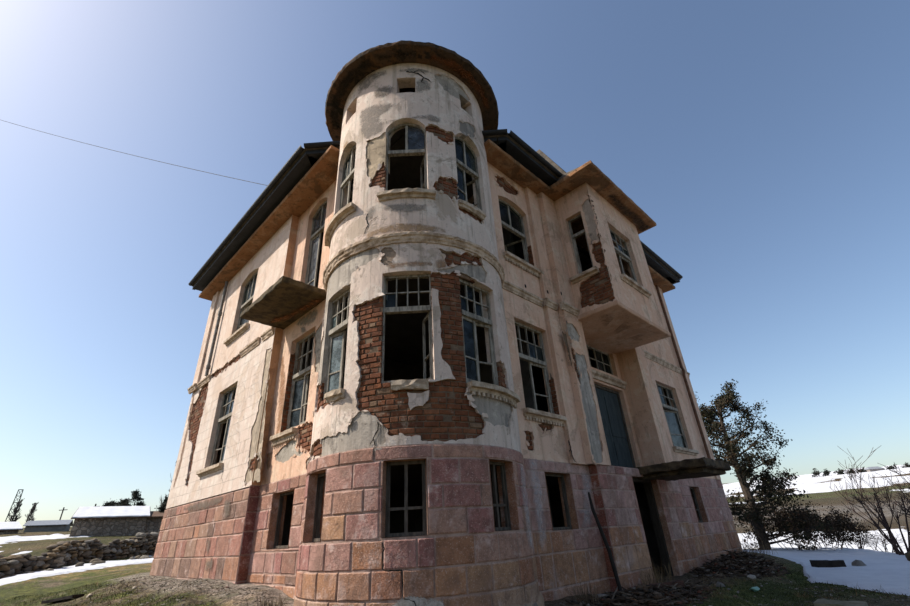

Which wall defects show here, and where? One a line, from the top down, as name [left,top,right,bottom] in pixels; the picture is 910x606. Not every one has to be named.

flaking render [365,132,390,188]
flaking render [425,121,477,145]
flaking render [433,175,484,224]
flaking render [578,193,618,308]
flaking render [275,248,514,466]
flaking render [185,355,241,486]
flaking render [244,349,272,485]
flaking render [524,423,552,451]
flaking render [549,373,559,415]
crack [382,543,416,606]